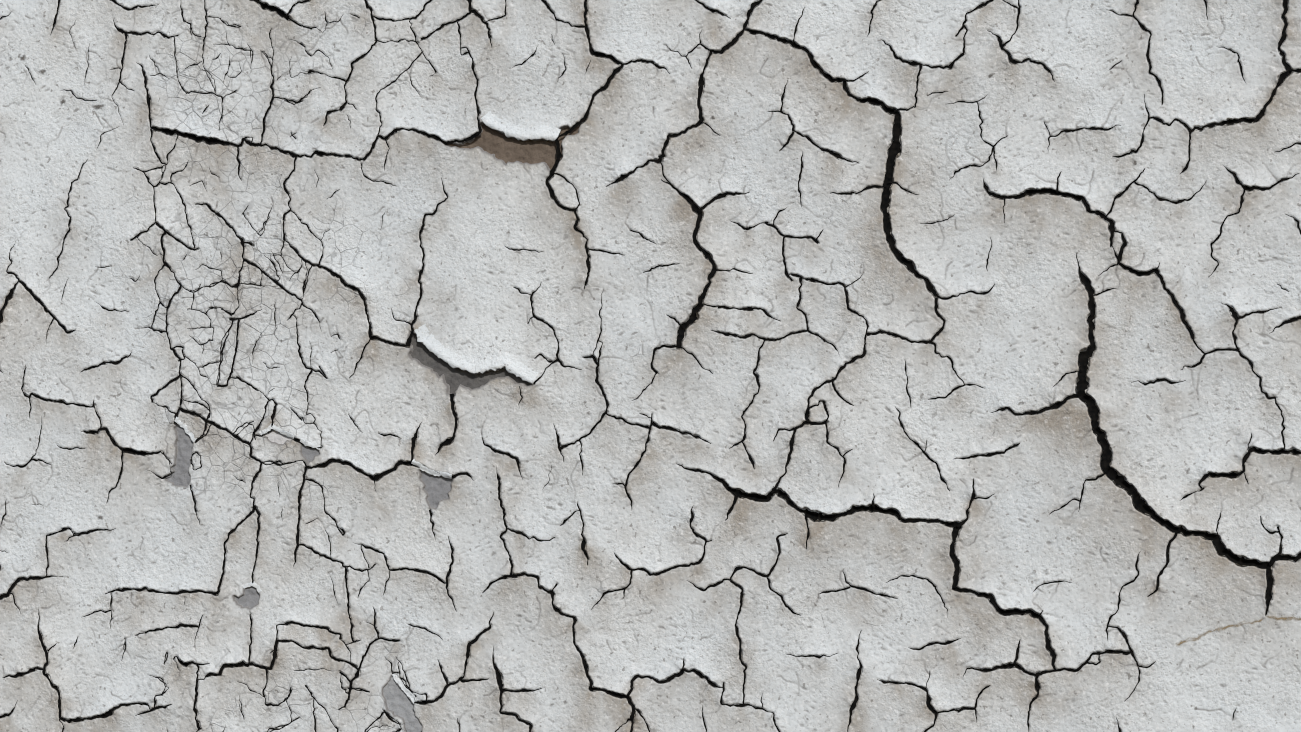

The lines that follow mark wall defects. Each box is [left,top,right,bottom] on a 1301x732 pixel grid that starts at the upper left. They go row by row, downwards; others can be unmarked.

peeling [447,111,580,170]
crack [0,0,542,732]
peeling [411,324,539,395]
crack [481,0,1301,732]
peeling [383,673,422,732]